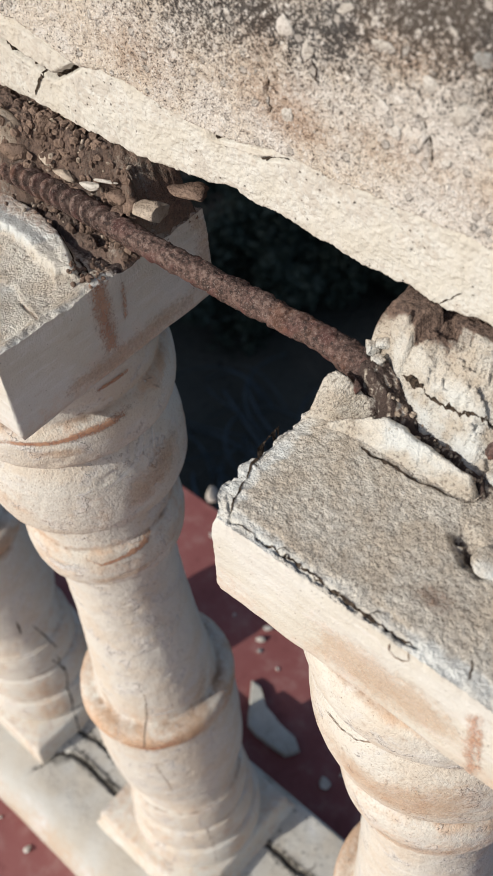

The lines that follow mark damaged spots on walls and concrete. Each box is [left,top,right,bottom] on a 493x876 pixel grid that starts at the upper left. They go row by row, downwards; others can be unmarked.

crack [7,41,79,95]
spalling [0,84,199,241]
crack [418,120,434,166]
spalling [0,178,134,270]
corrosion [88,280,117,352]
corrosion [1,409,125,447]
spalling [304,285,493,502]
crack [360,446,484,503]
crack [228,426,416,648]
crack [466,660,474,682]
crack [16,622,115,794]
crack [267,845,316,876]